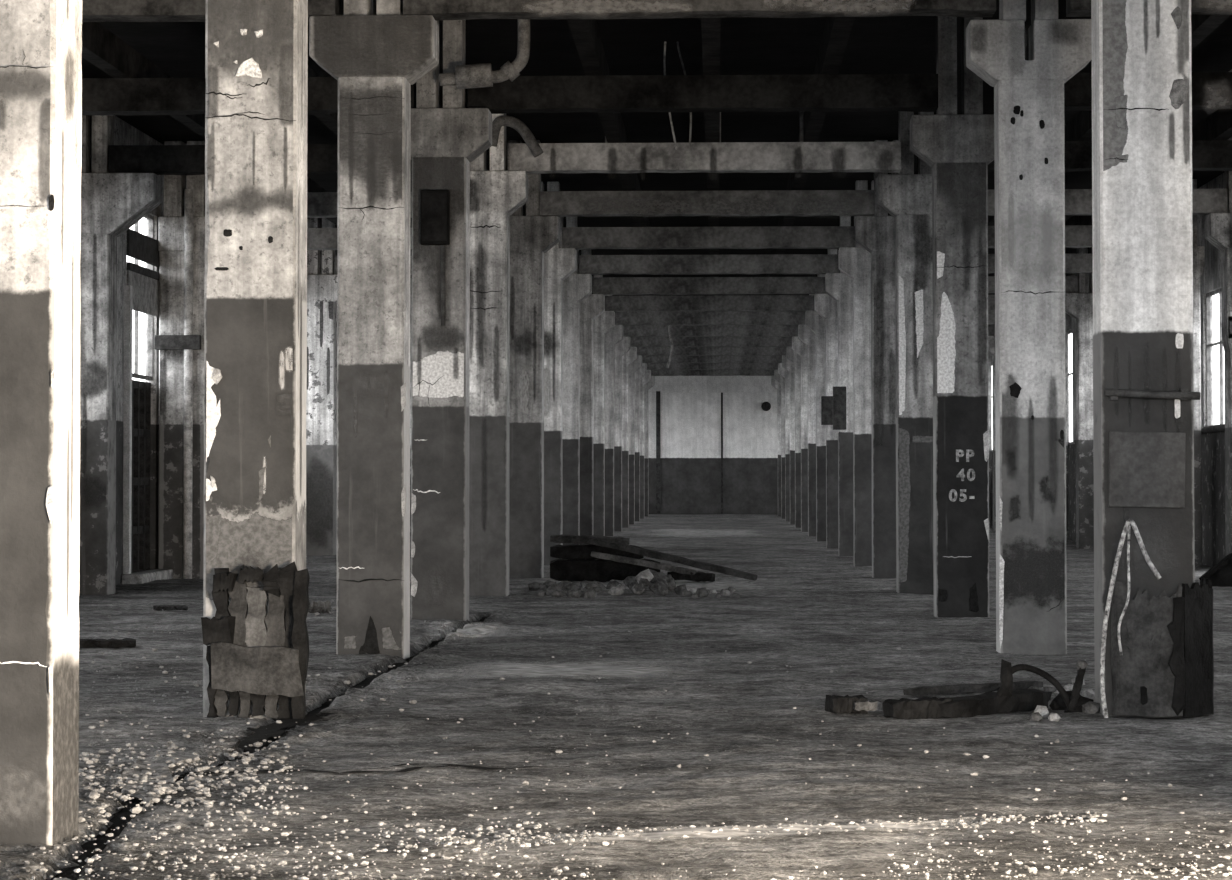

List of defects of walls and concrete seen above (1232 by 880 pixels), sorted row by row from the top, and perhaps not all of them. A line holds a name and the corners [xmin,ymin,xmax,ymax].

spalling [234,58,262,78]
peeling [1102,0,1129,171]
peeling [206,361,221,462]
peeling [206,467,292,600]
crack [0,660,46,668]
crack [51,617,577,880]